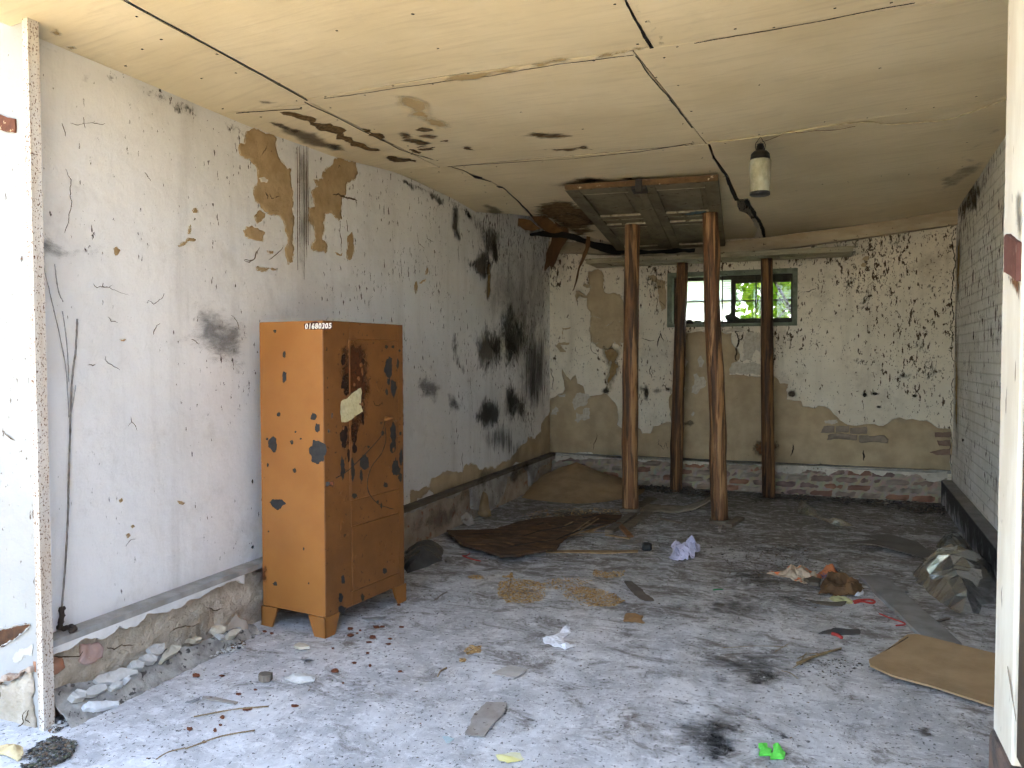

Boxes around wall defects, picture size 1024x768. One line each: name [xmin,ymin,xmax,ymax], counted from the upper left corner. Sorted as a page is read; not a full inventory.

flaking render [238,128,295,272]
flaking render [308,157,358,260]
water stain [275,98,448,266]
water stain [476,288,545,450]
flaking render [404,370,622,551]
flaking render [575,269,624,354]
flaking render [638,331,710,490]
flaking render [721,327,762,493]
flaking render [774,376,953,503]
spalling [0,623,37,728]
spalling [53,568,263,689]